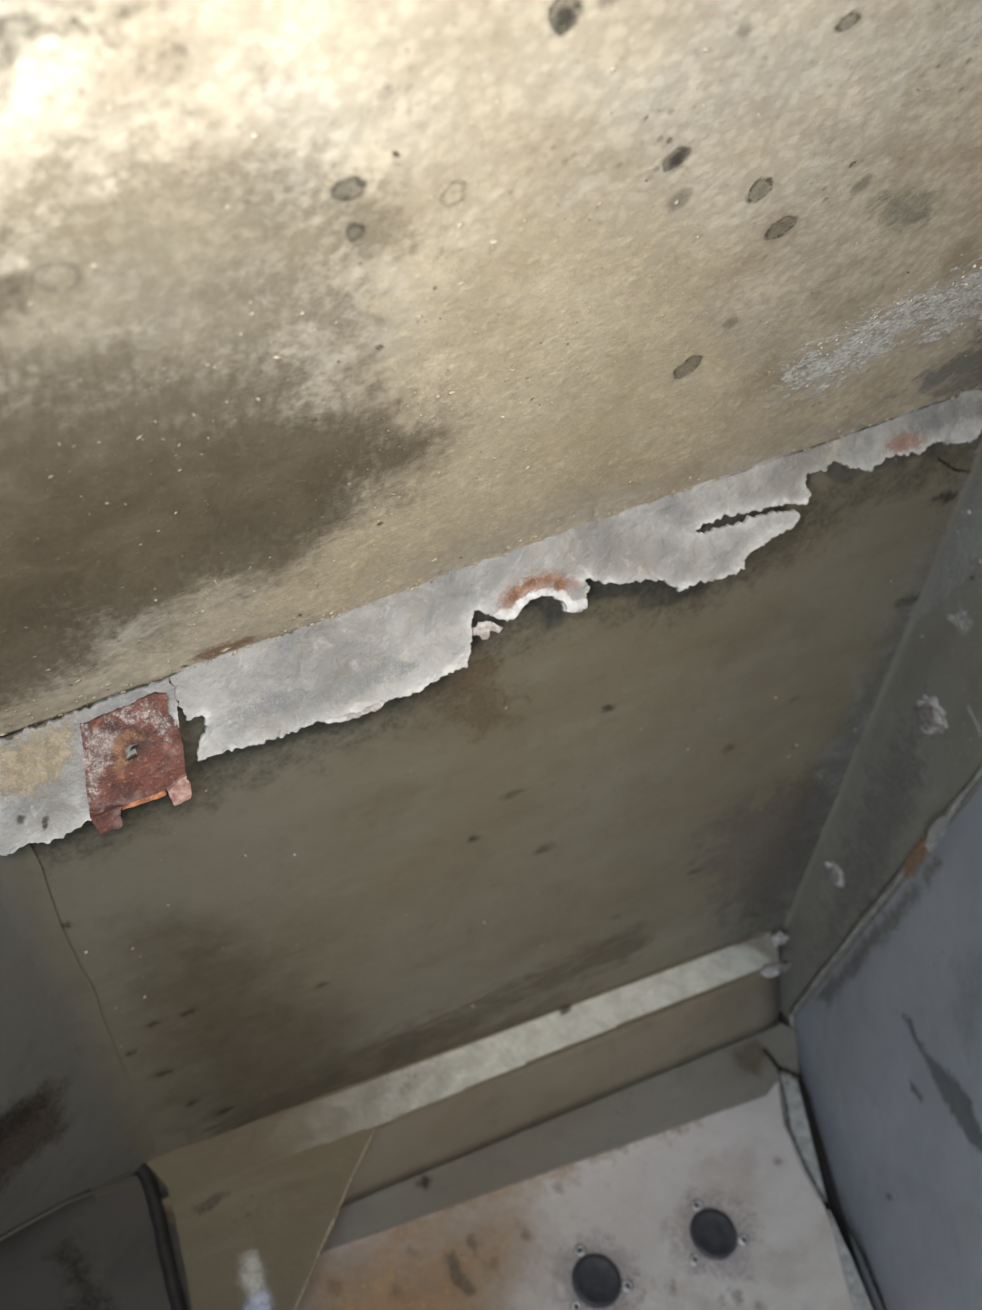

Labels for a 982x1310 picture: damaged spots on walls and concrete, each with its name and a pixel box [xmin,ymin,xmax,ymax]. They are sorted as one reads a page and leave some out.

water stain [548,0,582,35]
water stain [663,147,689,171]
water stain [0,153,982,706]
rust [0,389,982,856]